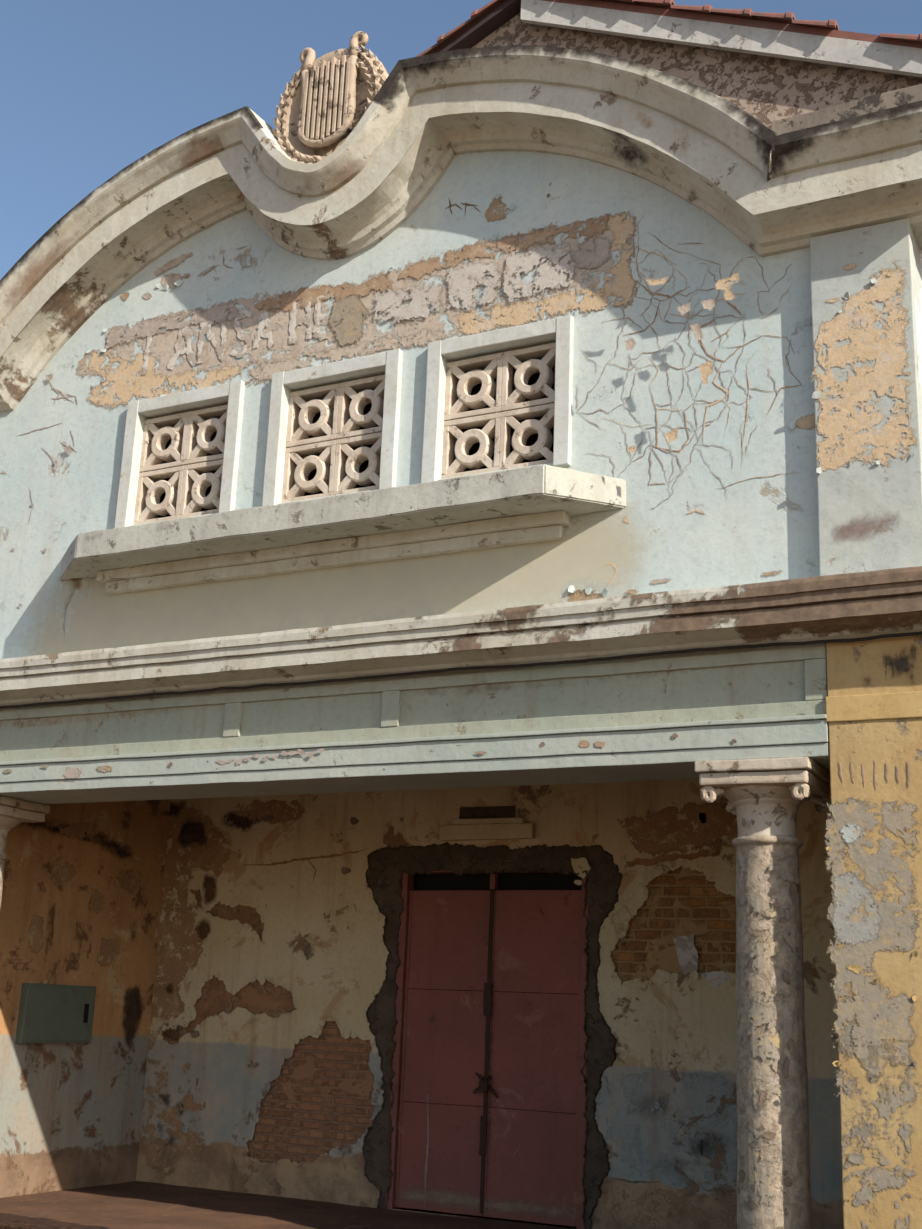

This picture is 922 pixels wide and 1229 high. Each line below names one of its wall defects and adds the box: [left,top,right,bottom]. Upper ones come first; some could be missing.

damp [373,45,922,181]
peeling [0,356,38,401]
peeling [42,268,106,338]
flaking render [73,193,638,411]
crack [576,217,801,523]
flaking render [789,265,919,474]
peeling [423,566,922,654]
flaking render [235,799,306,825]
flaking render [139,801,300,1175]
spalling [242,802,803,1229]
peeling [822,760,921,1229]